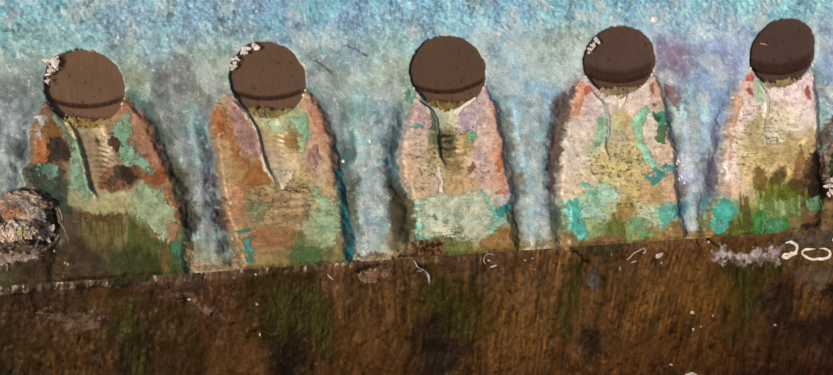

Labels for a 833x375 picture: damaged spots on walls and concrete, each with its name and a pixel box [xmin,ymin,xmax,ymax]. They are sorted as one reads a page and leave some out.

peeling [0,190,56,243]
leakage [599,111,833,264]